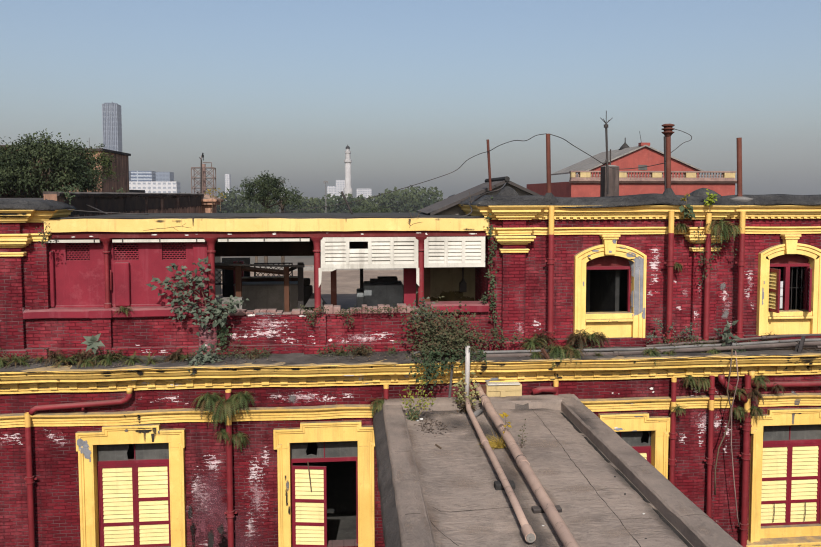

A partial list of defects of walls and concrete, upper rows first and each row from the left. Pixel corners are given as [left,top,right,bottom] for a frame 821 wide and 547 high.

peeling [609,239,645,319]
peeling [77,439,91,462]
crack [531,408,657,547]